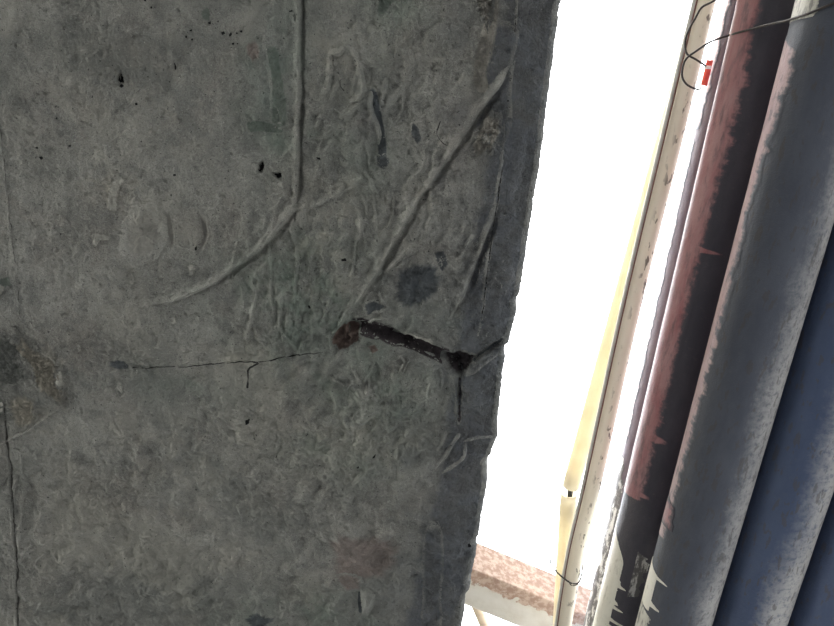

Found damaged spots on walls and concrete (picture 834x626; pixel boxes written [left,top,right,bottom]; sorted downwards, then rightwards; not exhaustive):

crack [101,347,334,390]